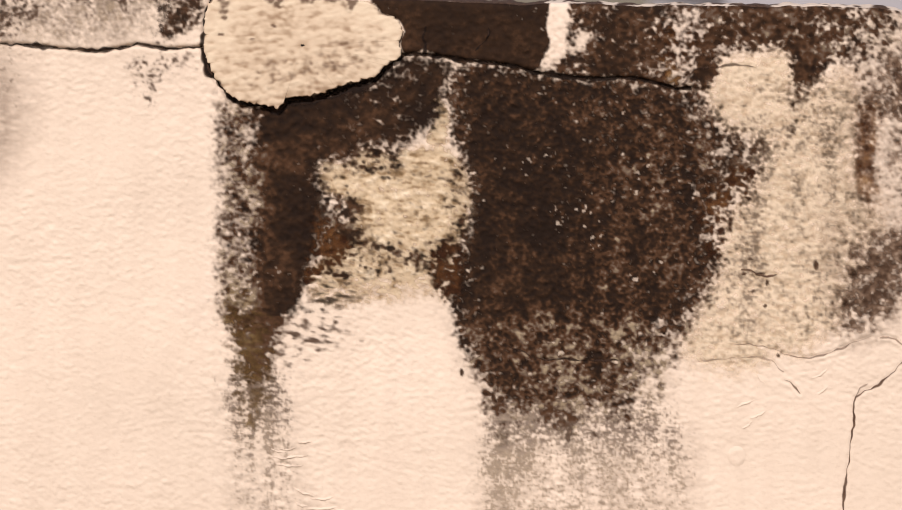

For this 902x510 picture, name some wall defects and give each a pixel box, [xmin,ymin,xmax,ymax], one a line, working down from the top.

flaking render [203,0,403,109]
crack [0,0,753,114]
damp [214,0,902,484]
crack [842,337,902,510]